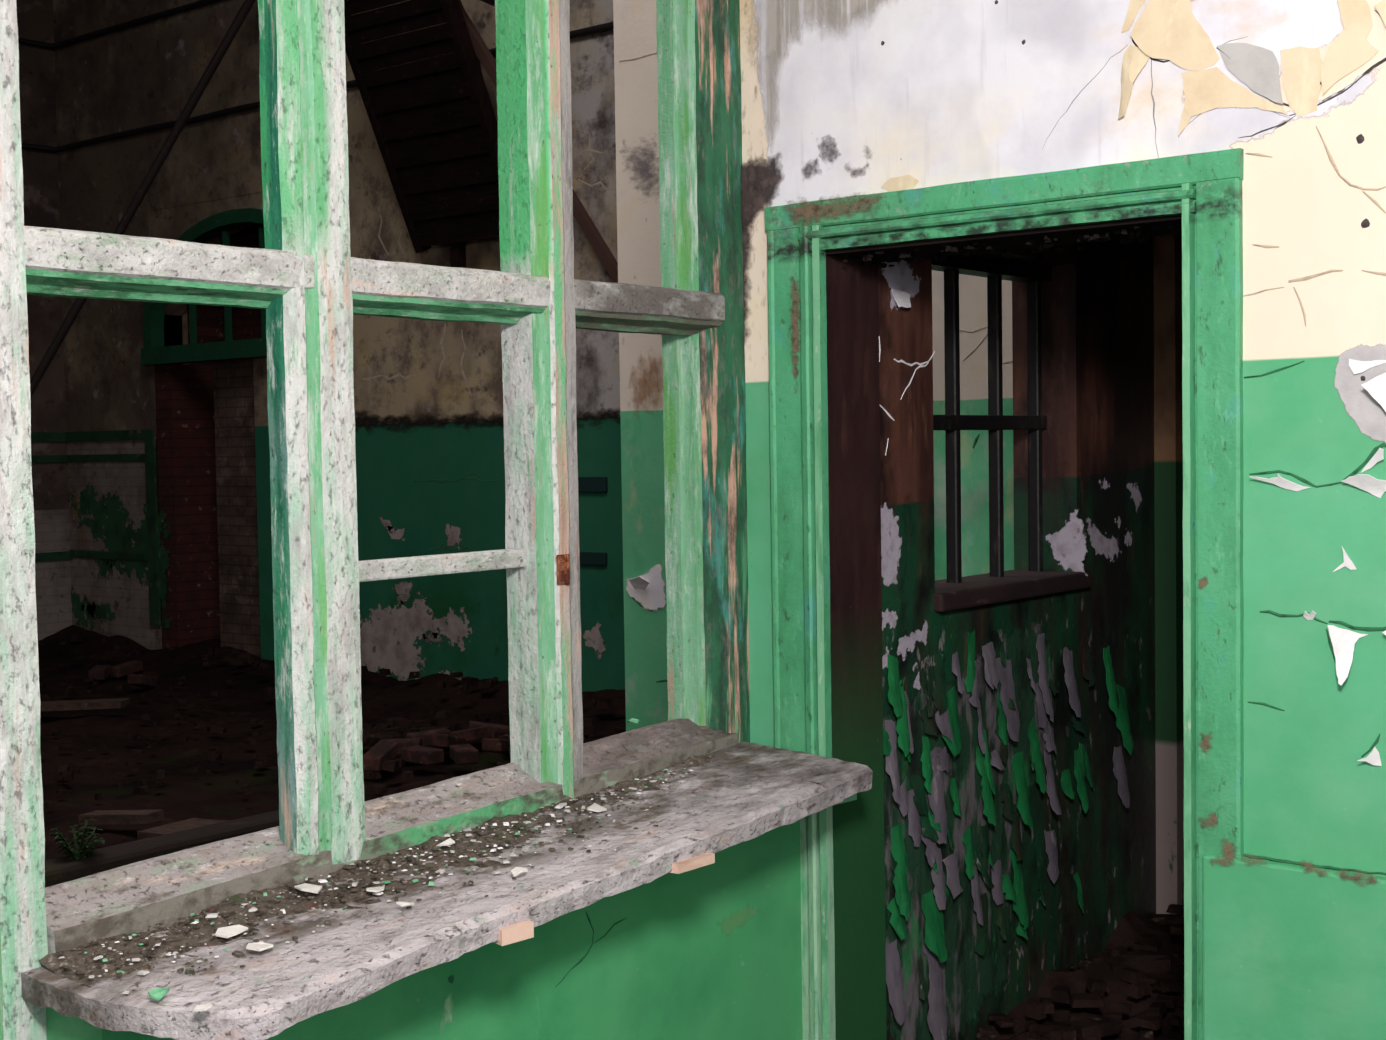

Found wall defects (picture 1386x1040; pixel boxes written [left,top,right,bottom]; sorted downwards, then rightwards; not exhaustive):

water stain [759,0,878,140]
water stain [803,141,837,177]
peeling [753,0,1386,207]
crack [1043,38,1217,158]
crack [1239,58,1386,213]
water stain [741,156,881,342]
crack [1243,269,1386,326]
crack [1244,361,1305,379]
flaking render [1249,344,1386,498]
peeling [1045,510,1132,576]
peeling [1260,610,1386,686]
peeling [882,609,1134,1040]